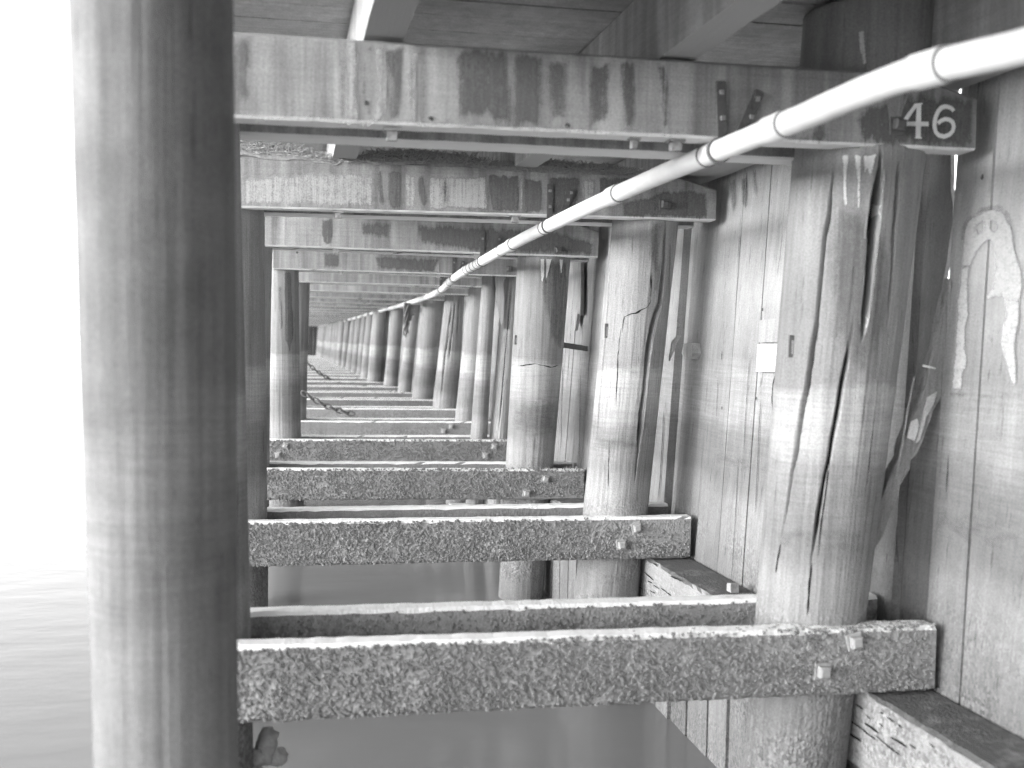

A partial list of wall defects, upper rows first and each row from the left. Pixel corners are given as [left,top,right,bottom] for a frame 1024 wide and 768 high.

leakage [457,50,564,129]
leakage [590,64,609,122]
leakage [622,62,635,124]
leakage [243,172,628,212]
crack [616,276,652,394]
crack [805,326,819,407]
peeling [952,210,1021,389]
crack [807,346,848,615]